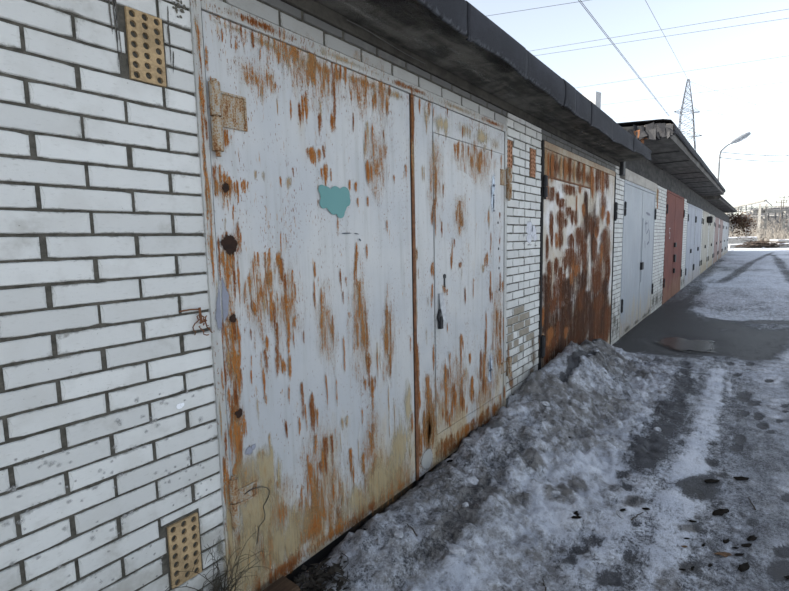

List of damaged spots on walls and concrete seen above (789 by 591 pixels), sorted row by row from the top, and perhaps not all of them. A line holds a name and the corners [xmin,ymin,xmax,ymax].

corrosion [193,8,505,591]
corrosion [538,152,612,367]